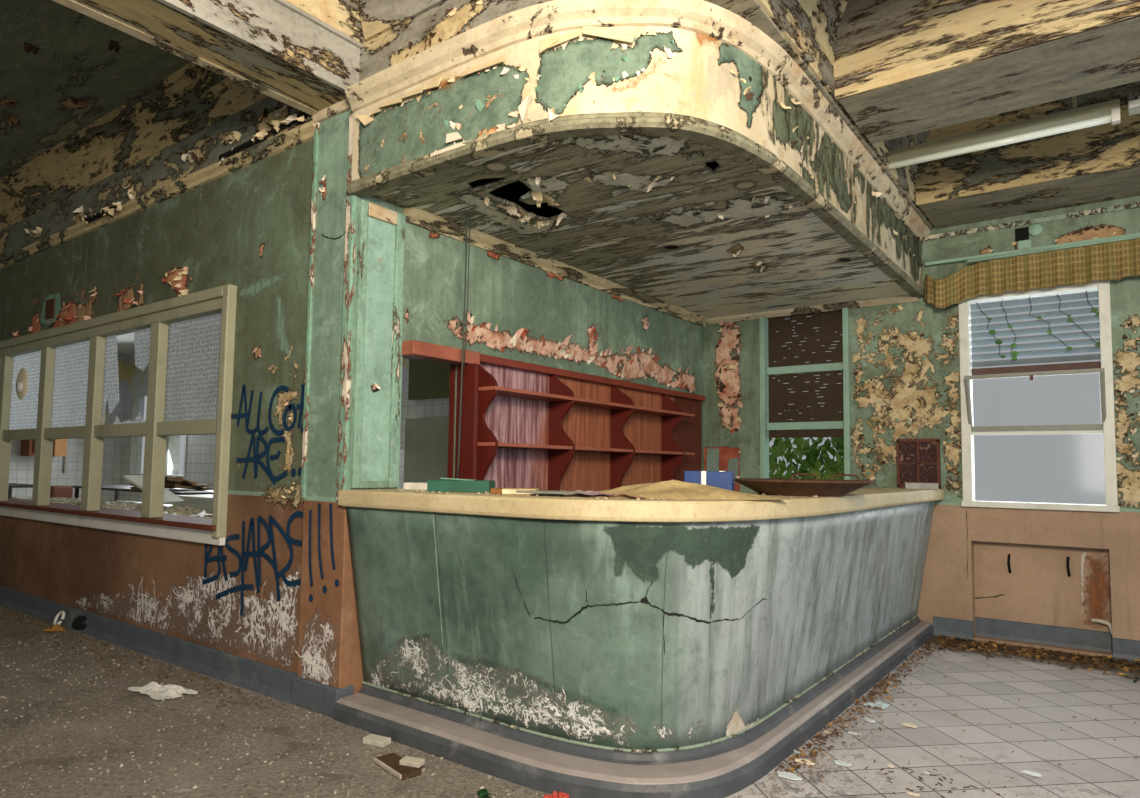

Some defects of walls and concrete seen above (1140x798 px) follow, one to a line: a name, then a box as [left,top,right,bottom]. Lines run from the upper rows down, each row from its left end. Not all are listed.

peeling [388,0,490,67]
peeling [217,105,306,165]
peeling [355,26,682,178]
flaking render [453,168,681,235]
peeling [649,196,803,229]
peeling [444,310,696,394]
peeling [704,322,743,492]
peeling [850,303,962,498]
peeling [1112,314,1140,508]
leakage [76,571,337,685]
crack [512,564,767,655]
leakage [368,637,638,746]